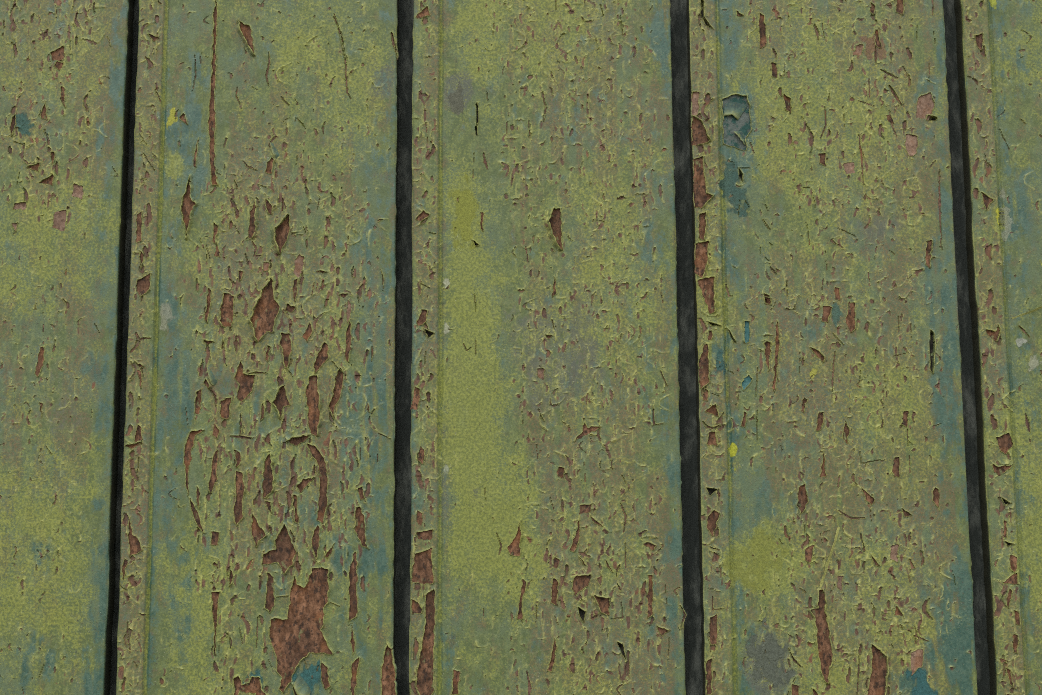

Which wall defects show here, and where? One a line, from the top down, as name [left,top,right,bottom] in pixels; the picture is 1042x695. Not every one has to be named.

peeling [203,287,235,348]
peeling [248,198,313,370]
peeling [547,207,563,251]
peeling [691,91,753,417]
peeling [763,320,781,391]
peeling [183,360,255,546]
peeling [233,293,353,695]
peeling [211,561,234,656]
peeling [348,486,369,695]
peeling [381,642,397,695]
peeling [790,589,834,695]
peeling [866,643,889,695]